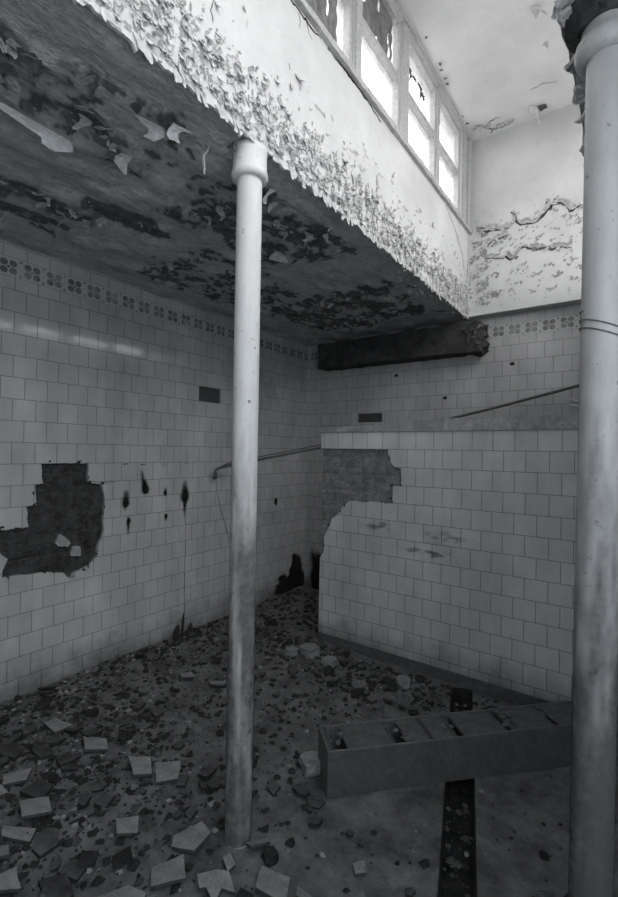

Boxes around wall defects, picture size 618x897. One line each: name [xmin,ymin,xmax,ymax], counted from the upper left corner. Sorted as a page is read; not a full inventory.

flaking render [0,22,237,306]
peeling [76,0,585,344]
peeling [0,460,105,579]
peeling [321,449,401,555]